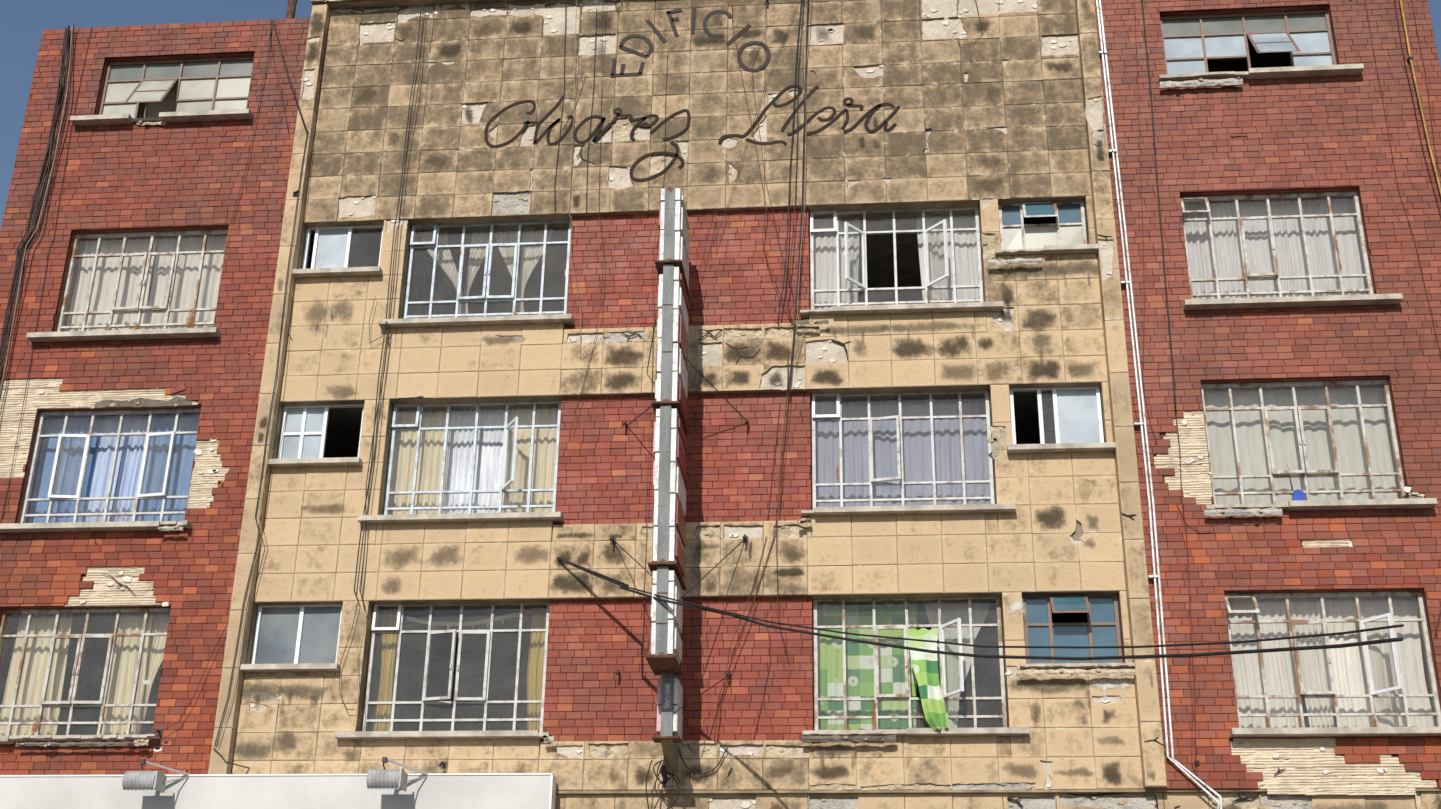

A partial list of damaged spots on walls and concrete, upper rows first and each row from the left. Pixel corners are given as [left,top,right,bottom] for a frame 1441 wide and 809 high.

spalling [359,0,618,55]
spalling [807,24,844,45]
spalling [921,0,1038,40]
spalling [573,118,688,175]
spalling [491,169,533,215]
spalling [608,167,634,189]
spalling [696,319,848,390]
spalling [90,388,191,409]
peeling [194,438,223,487]
water stain [1087,680,1130,707]
spalling [542,735,629,759]
spalling [682,735,896,759]